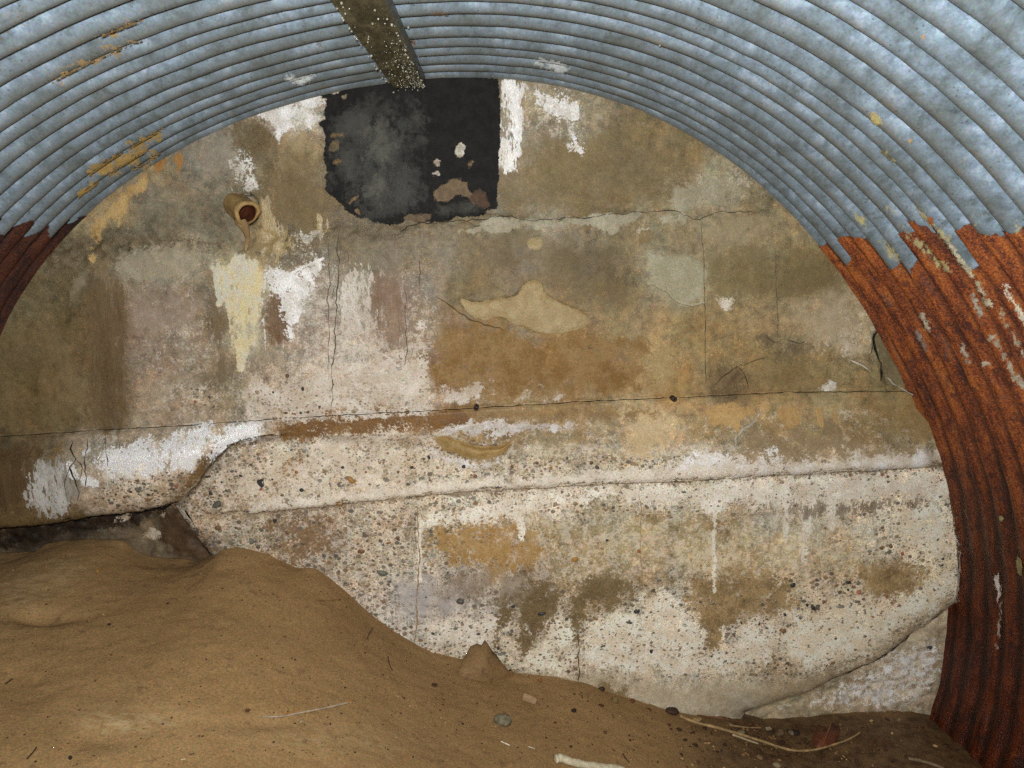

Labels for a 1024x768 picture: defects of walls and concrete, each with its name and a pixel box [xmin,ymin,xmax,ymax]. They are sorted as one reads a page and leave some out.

rust [0,216,86,336]
crack [1,235,913,530]
leakage [0,79,962,715]
crack [398,210,757,238]
rust [819,217,1024,768]
crack [815,610,944,688]